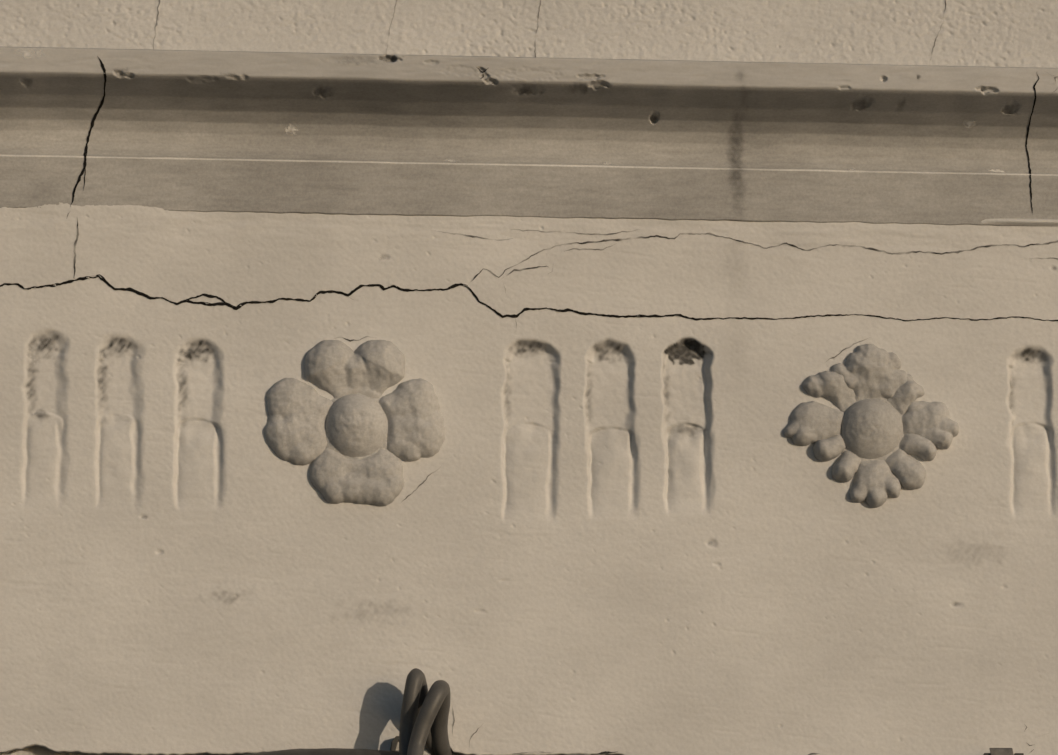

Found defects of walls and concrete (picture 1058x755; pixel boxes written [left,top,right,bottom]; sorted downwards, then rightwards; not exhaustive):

crack [0,57,1058,321]